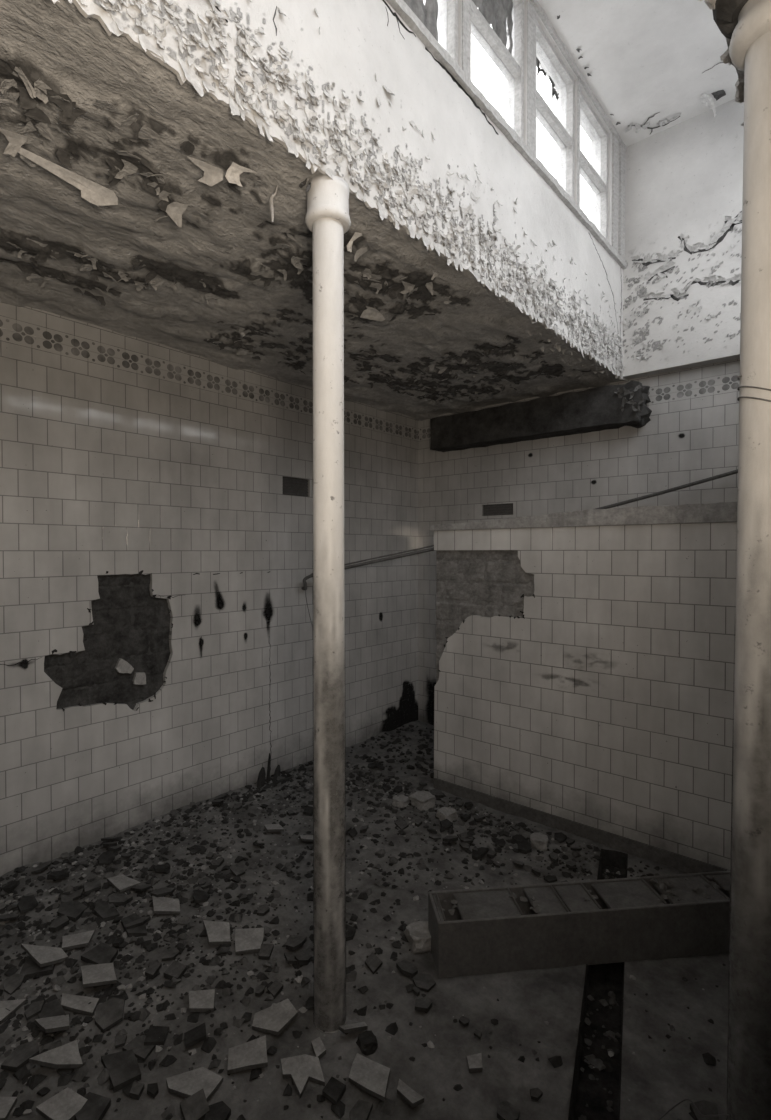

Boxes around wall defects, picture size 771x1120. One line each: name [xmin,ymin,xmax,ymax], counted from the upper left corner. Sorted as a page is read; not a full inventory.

spalling [0,58,313,375]
peeling [51,0,745,412]
peeling [44,570,173,712]
peeling [436,550,535,683]